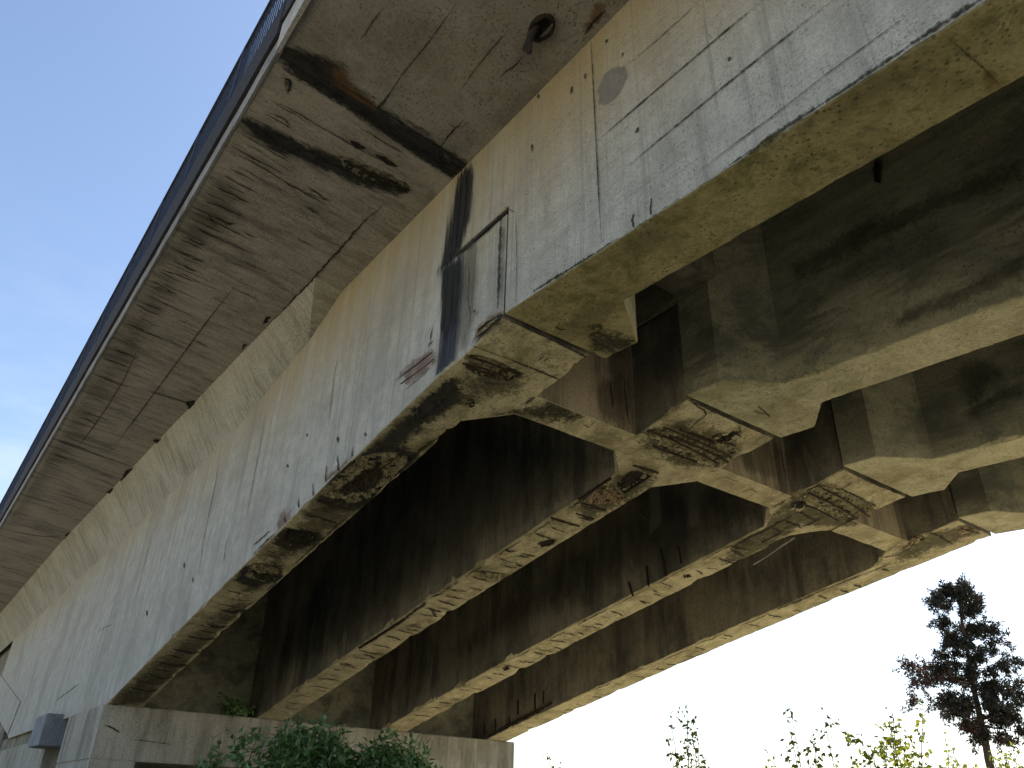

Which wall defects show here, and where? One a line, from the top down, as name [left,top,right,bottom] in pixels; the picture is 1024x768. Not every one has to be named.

leakage [241,46,529,569]
spalling [462,312,521,385]
leakage [583,325,636,355]
spalling [312,442,419,513]
leakage [495,402,585,424]
spalling [647,426,741,468]
spalling [677,481,881,579]
spalling [111,498,325,705]
spalling [293,465,659,705]
spalling [627,547,672,605]